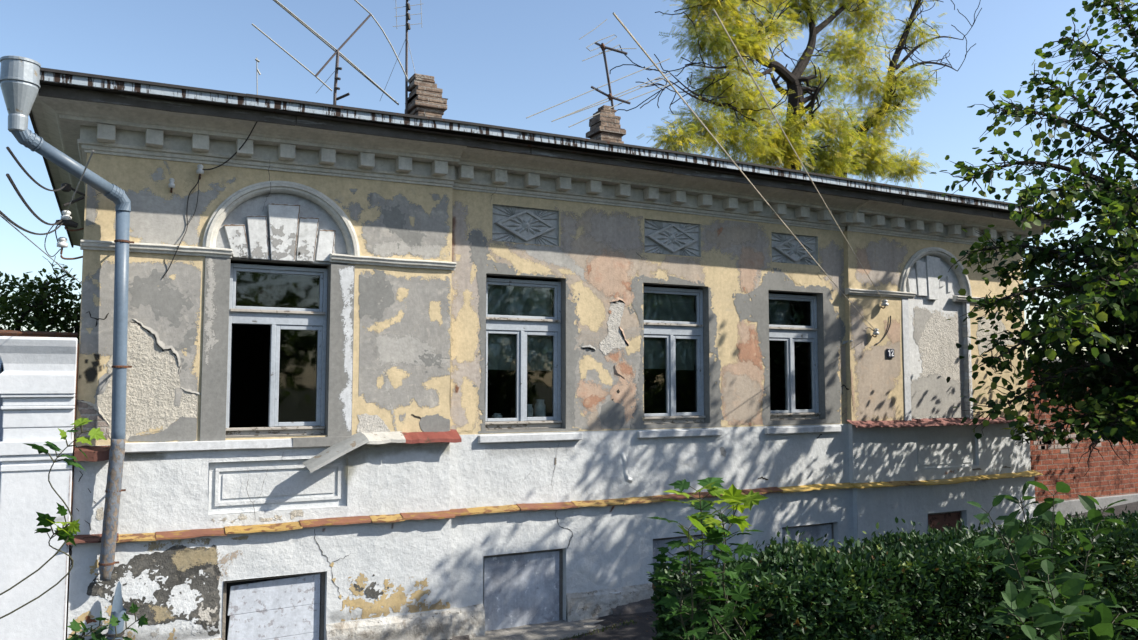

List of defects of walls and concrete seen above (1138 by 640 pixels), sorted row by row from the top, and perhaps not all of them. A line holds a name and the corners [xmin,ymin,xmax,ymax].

peeling [86,185,100,227]
peeling [124,160,236,246]
peeling [76,260,115,440]
peeling [125,258,219,441]
peeling [335,189,771,433]
peeling [789,237,1019,422]
peeling [68,605,112,639]
crack [314,529,348,597]
peeling [329,562,450,621]